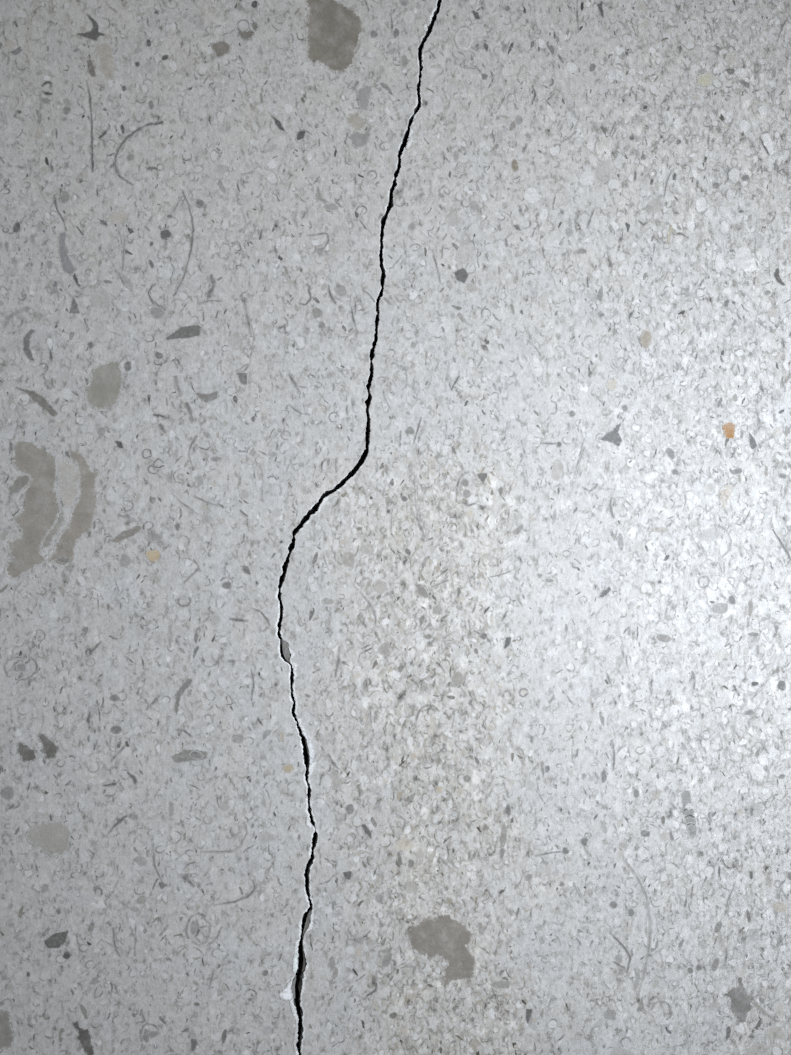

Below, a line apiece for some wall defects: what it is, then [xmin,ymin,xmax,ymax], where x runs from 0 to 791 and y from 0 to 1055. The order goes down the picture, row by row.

crack [275,0,443,1055]